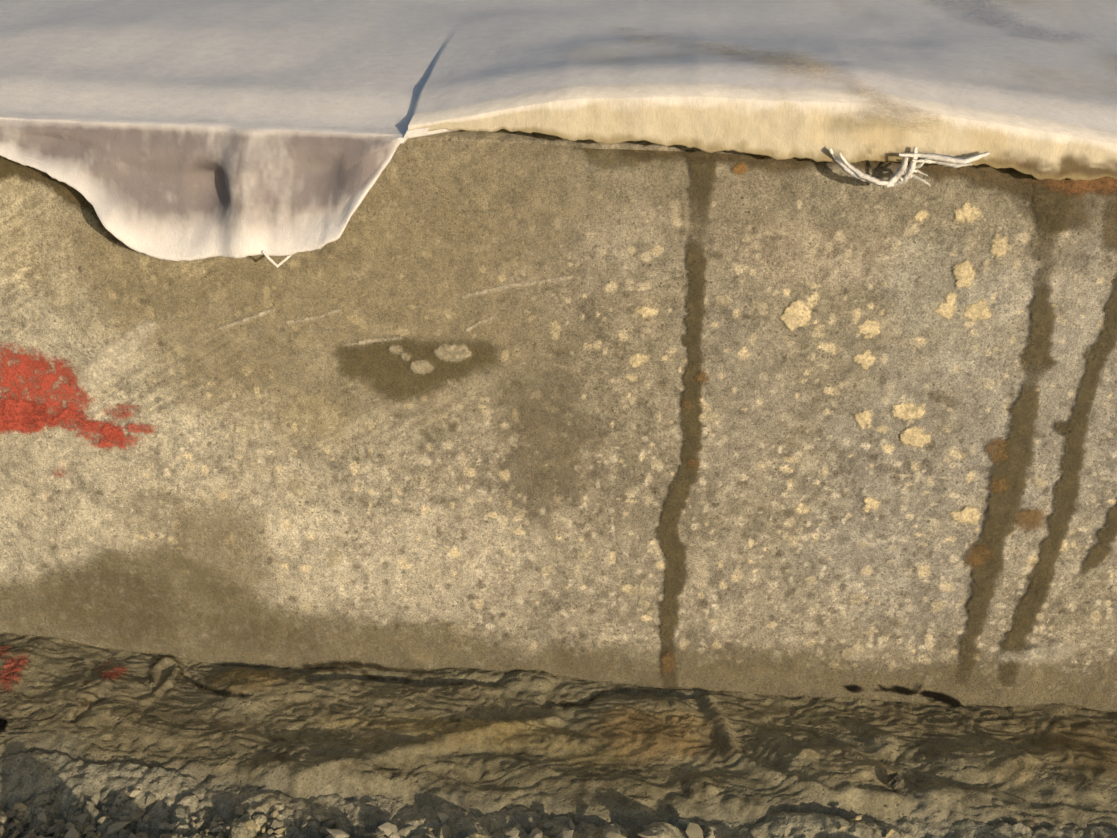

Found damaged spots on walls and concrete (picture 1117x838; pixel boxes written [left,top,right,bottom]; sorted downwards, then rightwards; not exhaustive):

damp [0,146,1117,712]
crack [847,685,964,707]